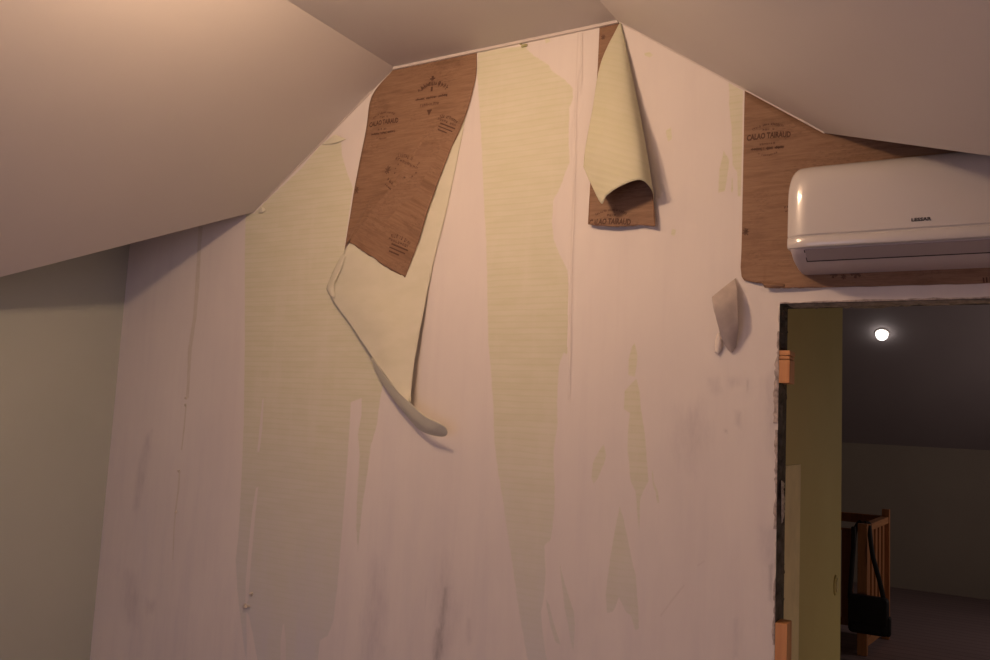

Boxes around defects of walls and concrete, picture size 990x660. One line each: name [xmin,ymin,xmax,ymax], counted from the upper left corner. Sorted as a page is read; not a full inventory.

peeling [234,134,385,660]
peeling [475,38,574,660]